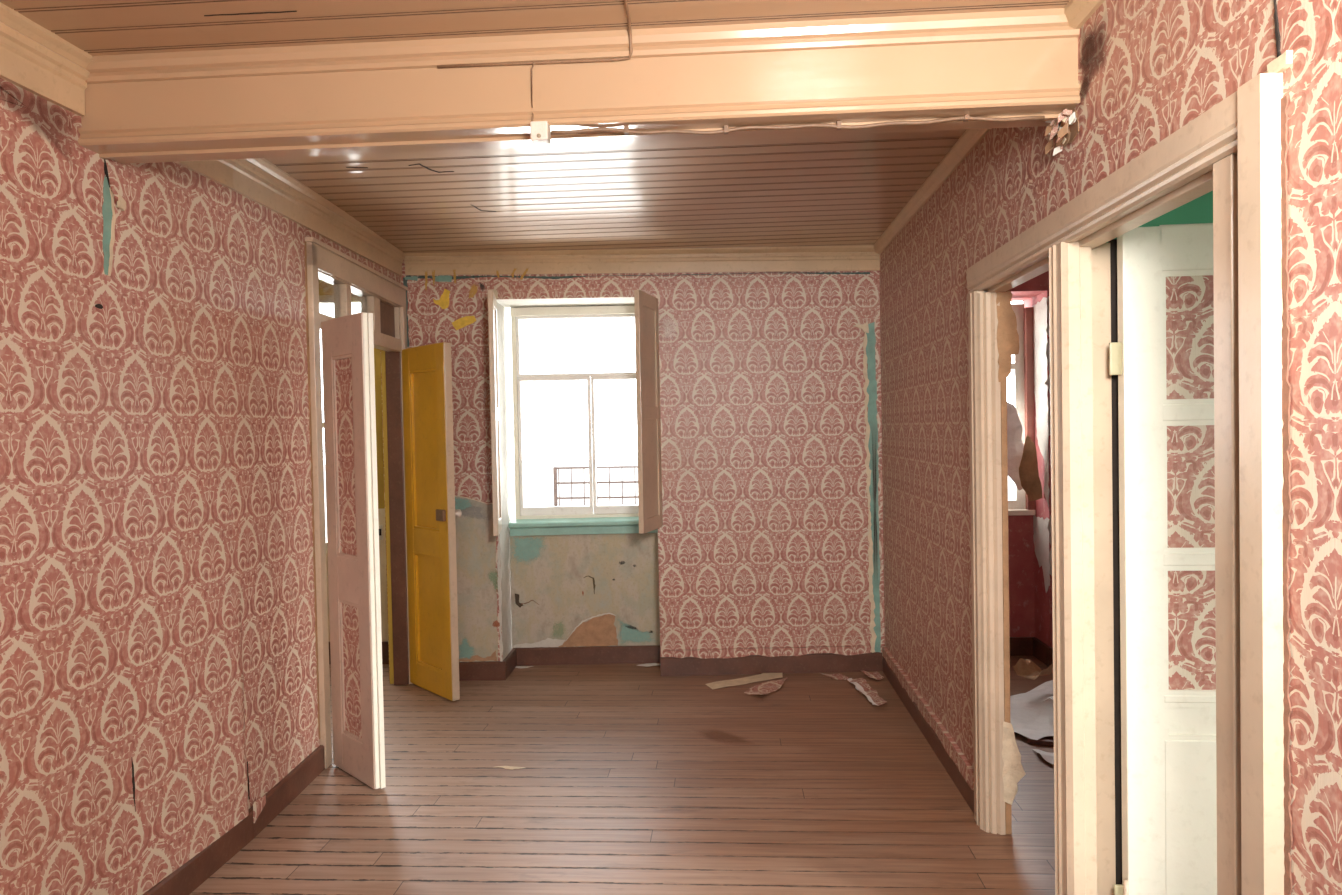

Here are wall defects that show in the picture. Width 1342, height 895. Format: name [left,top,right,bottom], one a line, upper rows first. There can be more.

spalling [1045,109,1080,156]
peeling [102,159,126,276]
peeling [853,322,881,653]
peeling [1032,296,1052,593]
peeling [455,495,618,662]